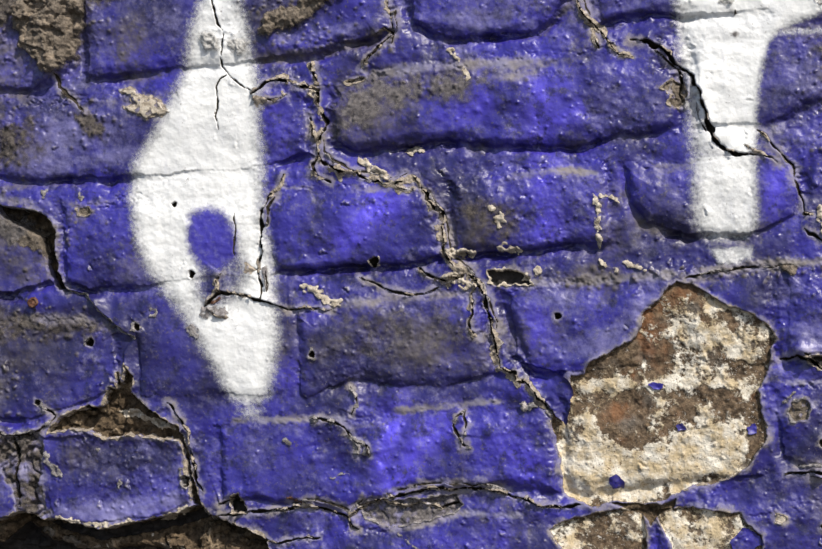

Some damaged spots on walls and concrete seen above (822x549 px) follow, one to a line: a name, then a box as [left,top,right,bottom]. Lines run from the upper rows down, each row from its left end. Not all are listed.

crack [576,0,822,241]
crack [203,0,553,412]
crack [685,264,794,278]
crack [780,353,822,368]
spalling [0,363,270,549]
crack [167,403,203,491]
crack [310,386,371,457]
crack [453,409,472,449]
peeling [525,282,777,549]
crack [784,463,822,479]
crack [212,482,580,544]